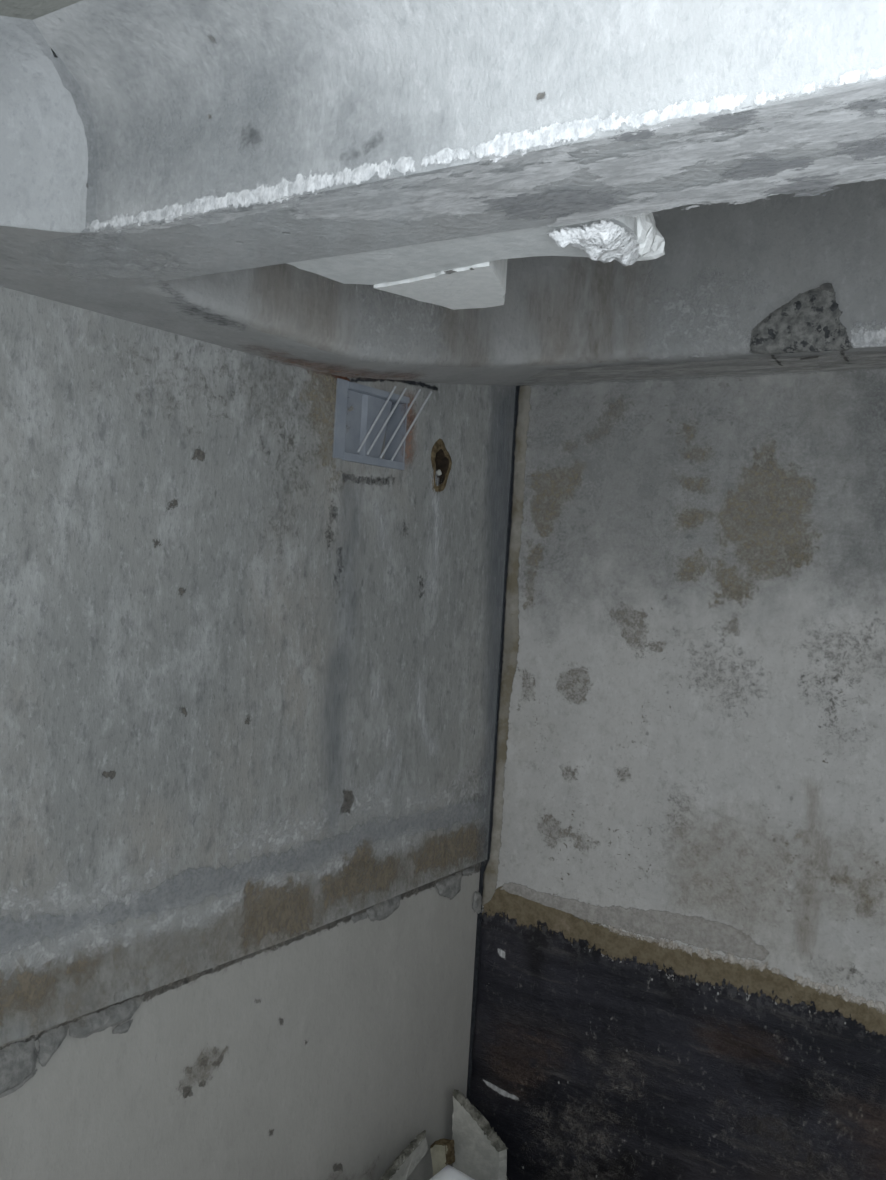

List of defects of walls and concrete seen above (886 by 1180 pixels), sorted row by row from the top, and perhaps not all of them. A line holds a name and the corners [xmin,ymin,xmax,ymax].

water stain [76,63,886,276]
spalling [750,283,853,355]
water stain [527,271,886,579]
water stain [0,826,487,1028]
water stain [608,925,886,1013]
spalling [0,995,145,1098]
spalling [179,1047,228,1098]